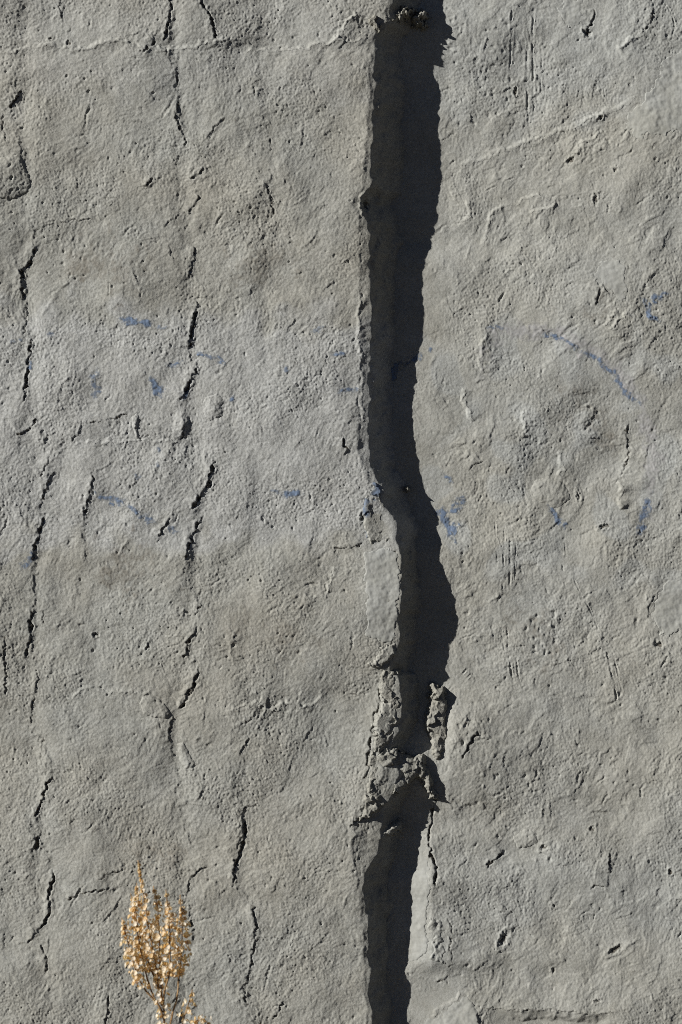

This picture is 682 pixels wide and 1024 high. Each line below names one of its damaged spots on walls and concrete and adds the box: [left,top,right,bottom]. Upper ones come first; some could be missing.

crack [20,249,35,298]
crack [16,340,35,435]
crack [180,311,198,399]
crack [185,465,214,558]
crack [3,611,44,694]
crack [169,635,198,730]
spalling [367,643,401,755]
crack [34,779,51,849]
crack [233,804,256,880]
peeling [383,817,403,836]
crack [428,800,438,885]
crack [31,873,94,968]